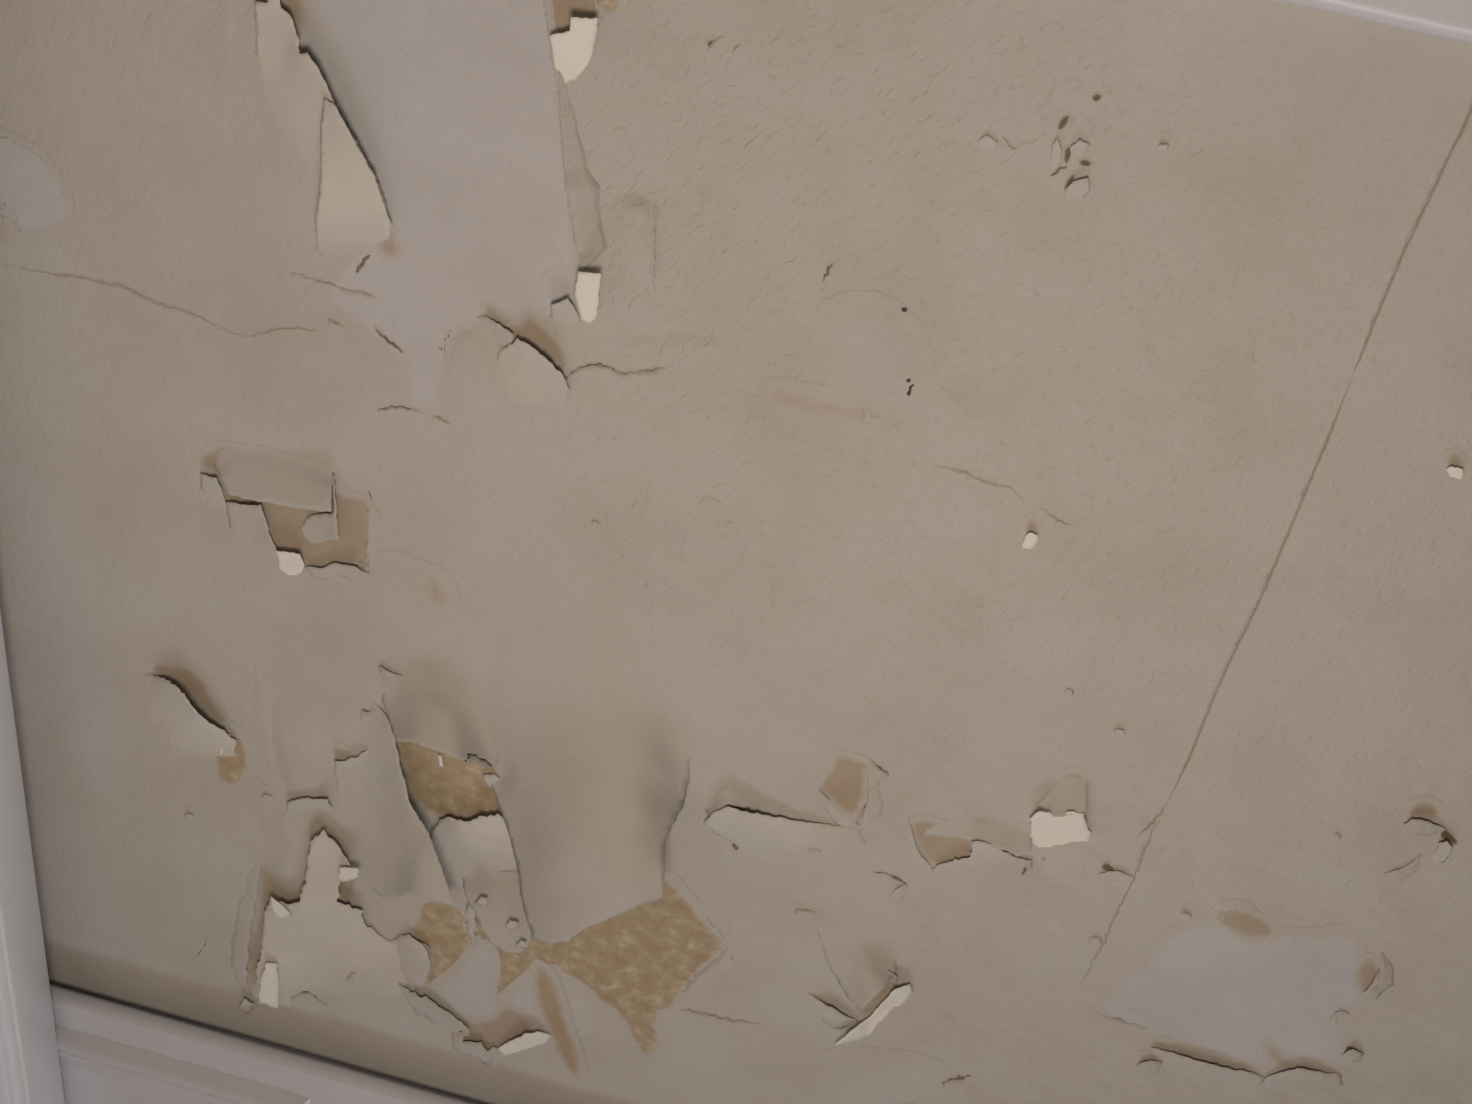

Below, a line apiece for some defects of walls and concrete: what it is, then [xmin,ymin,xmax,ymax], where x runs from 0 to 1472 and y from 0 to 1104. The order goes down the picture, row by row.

peeling [250,0,670,419]
peeling [1050,113,1094,200]
peeling [1090,92,1103,103]
crack [4,263,450,353]
peeling [0,401,273,817]
peeling [195,441,382,581]
crack [1078,93,1472,989]
peeling [230,555,889,1086]
peeling [904,767,1133,884]
peeling [1384,796,1460,882]
peeling [806,909,914,1046]
peeling [1095,896,1394,1090]